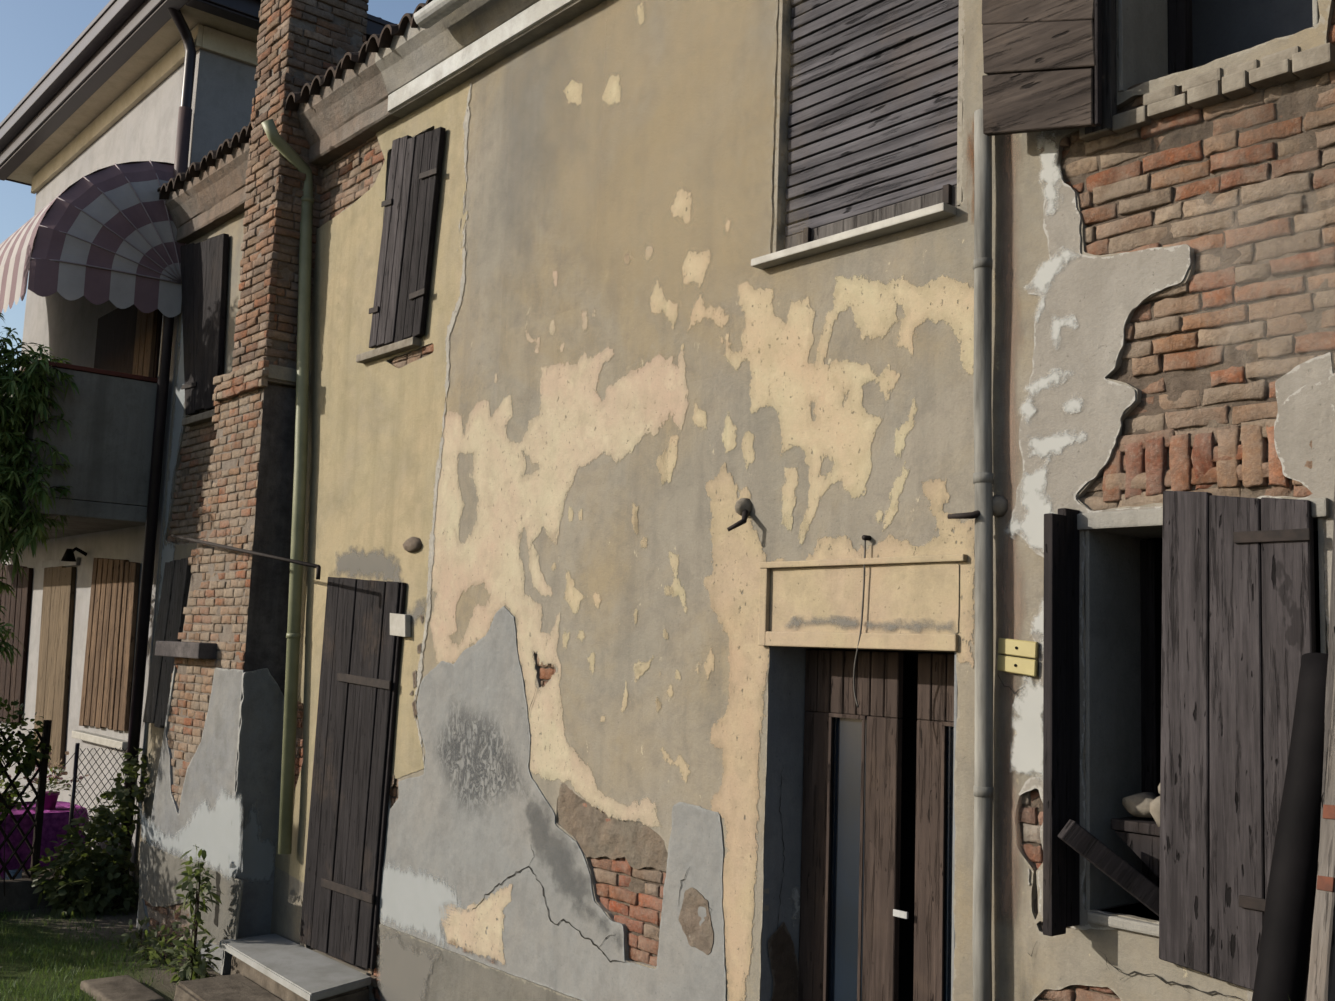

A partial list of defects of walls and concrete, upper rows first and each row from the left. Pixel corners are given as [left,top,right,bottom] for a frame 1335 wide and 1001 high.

peeling [602,75,621,106]
flaking render [319,136,385,227]
flaking render [1005,70,1335,650]
peeling [391,80,975,1001]
leakage [444,721,511,795]
flaking render [1011,601,1044,931]
crack [472,849,624,963]
flaking render [1071,855,1119,930]
flaking render [1037,985,1121,1001]
crack [1104,954,1242,1000]